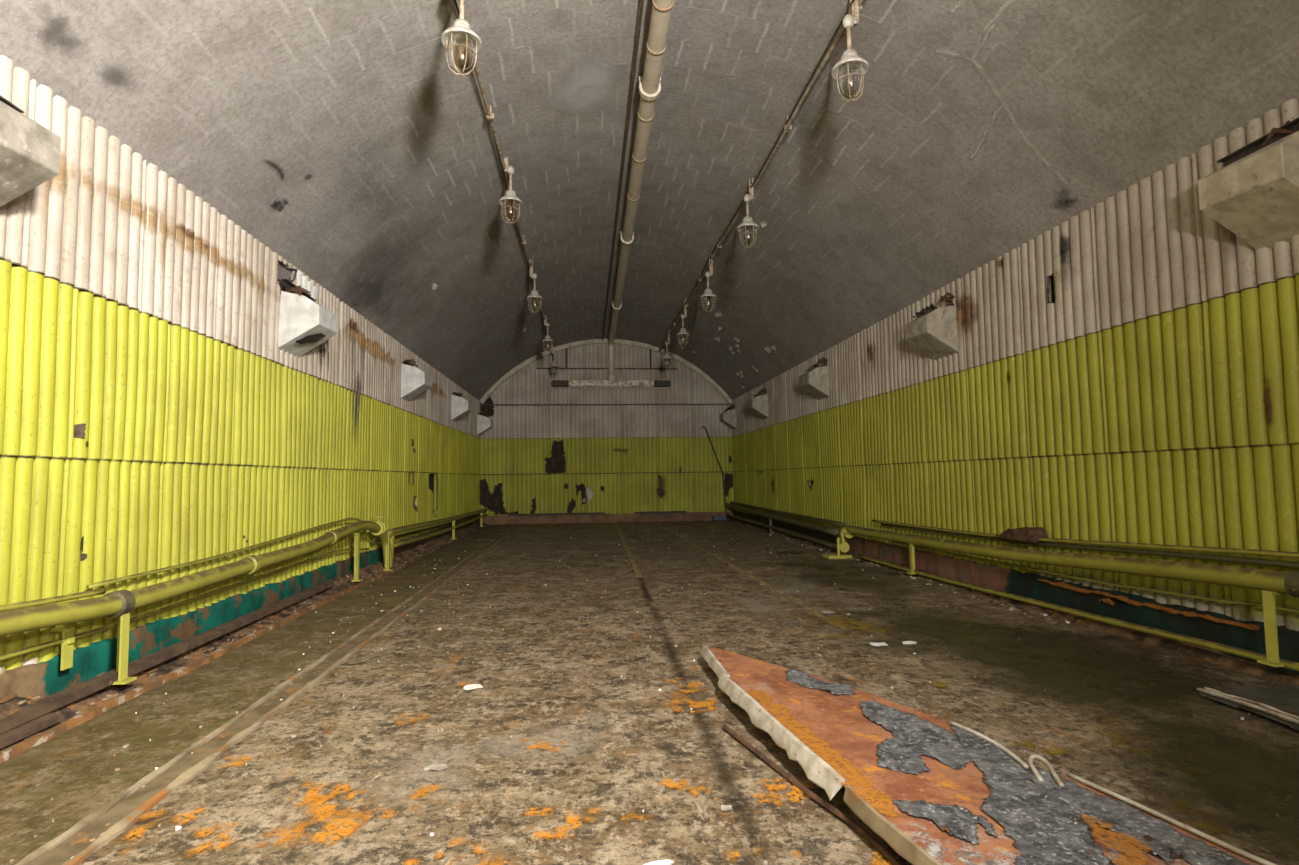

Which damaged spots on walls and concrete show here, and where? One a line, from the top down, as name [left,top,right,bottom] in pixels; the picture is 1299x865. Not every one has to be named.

corrosion [110,193,264,289]
corrosion [340,319,393,365]
corrosion [956,296,977,331]
spalling [479,478,537,515]
spalling [544,440,604,513]
peeling [1038,572,1299,631]